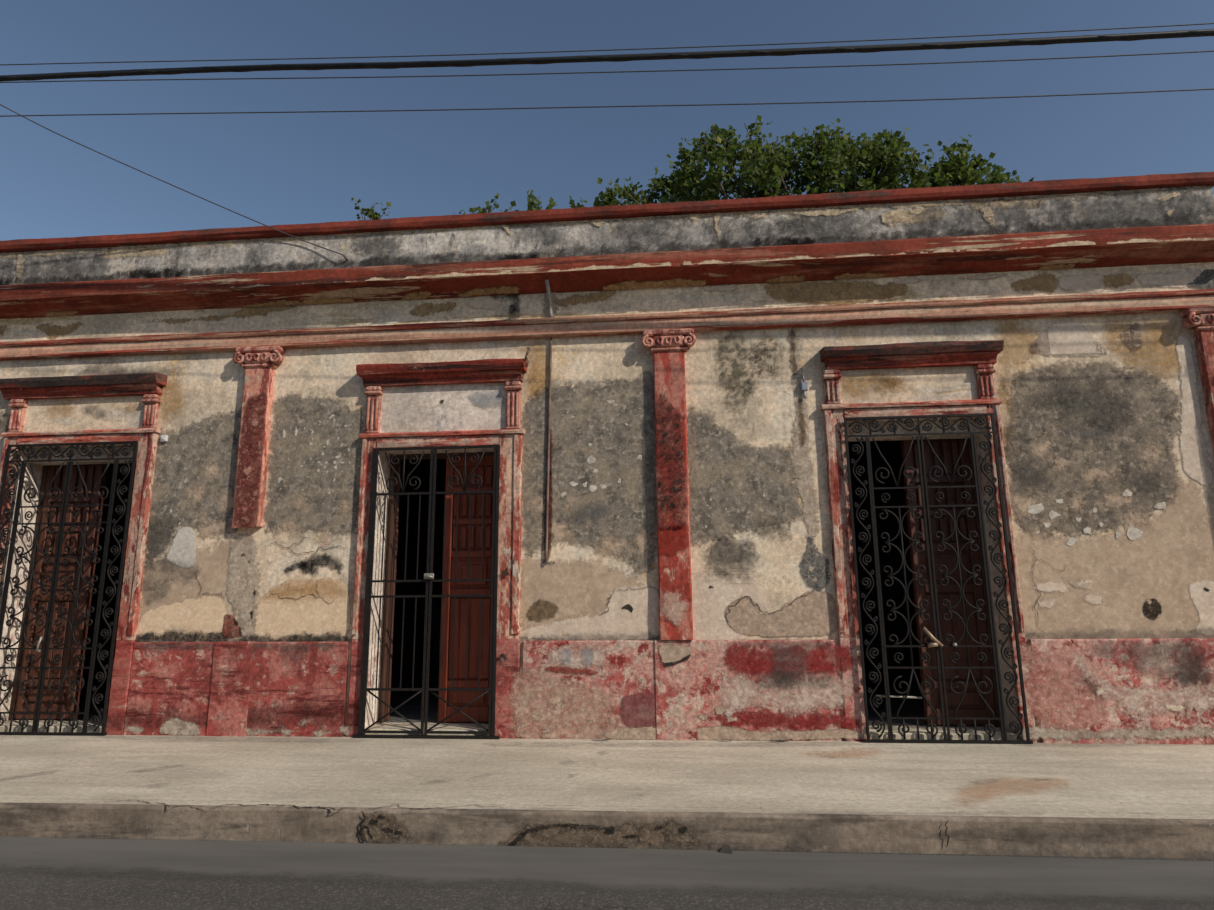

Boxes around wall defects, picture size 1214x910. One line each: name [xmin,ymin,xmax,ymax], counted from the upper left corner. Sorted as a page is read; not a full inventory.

damp [0,187,1214,285]
peeling [1015,237,1214,249]
peeling [333,270,519,317]
peeling [548,253,876,307]
spalling [764,273,908,305]
spalling [960,264,1075,293]
peeling [1103,269,1214,289]
spalling [724,537,838,637]
peeling [510,643,657,739]
peeling [697,671,866,741]
peeling [1018,645,1214,741]
spalling [498,818,699,849]